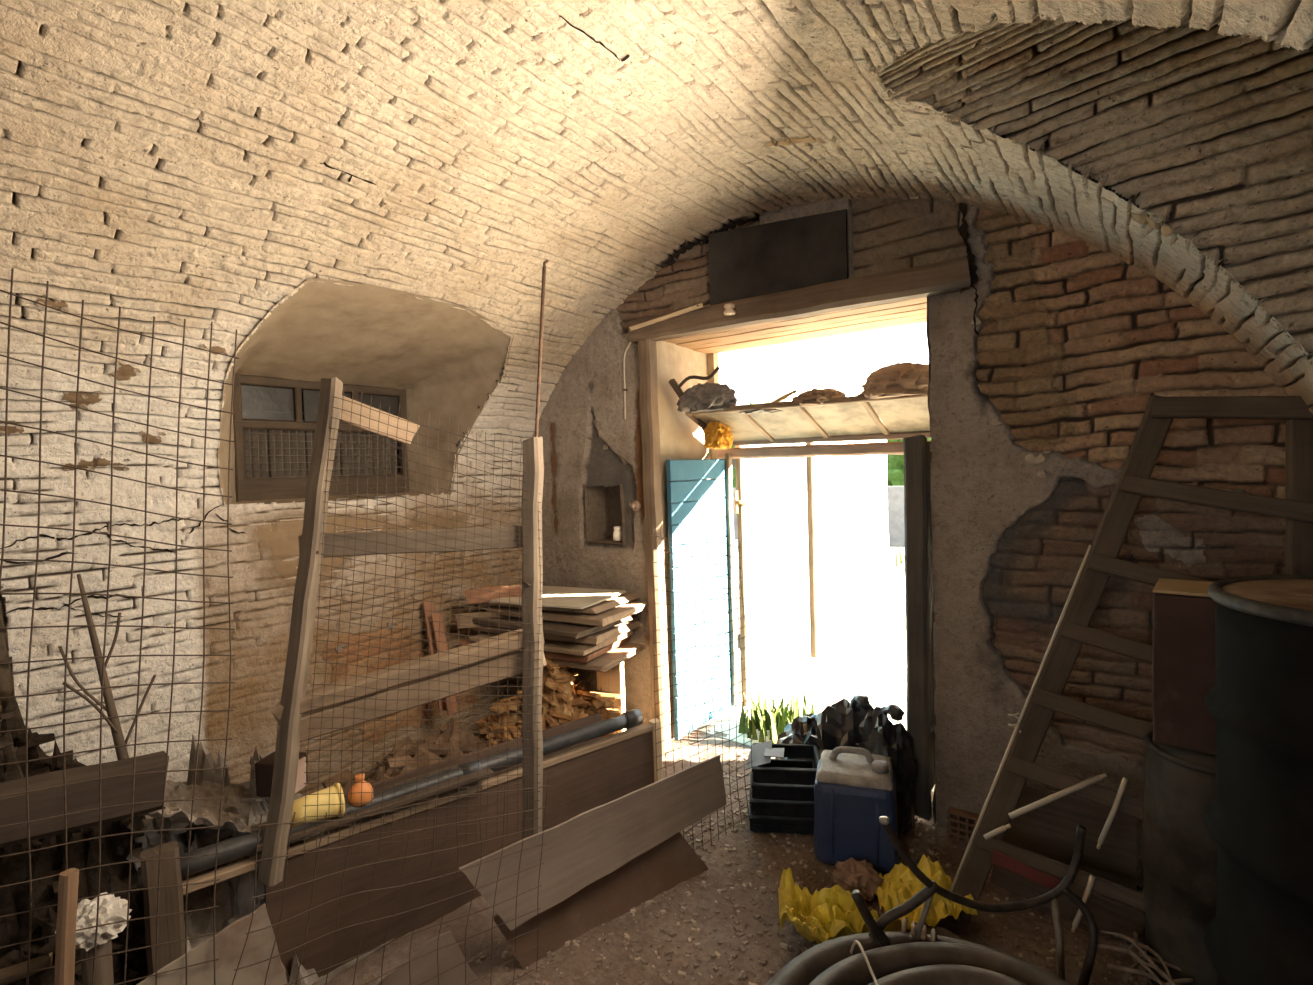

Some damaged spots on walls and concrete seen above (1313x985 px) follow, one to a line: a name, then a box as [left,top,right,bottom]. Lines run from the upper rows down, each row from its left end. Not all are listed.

crack [959,202,979,335]